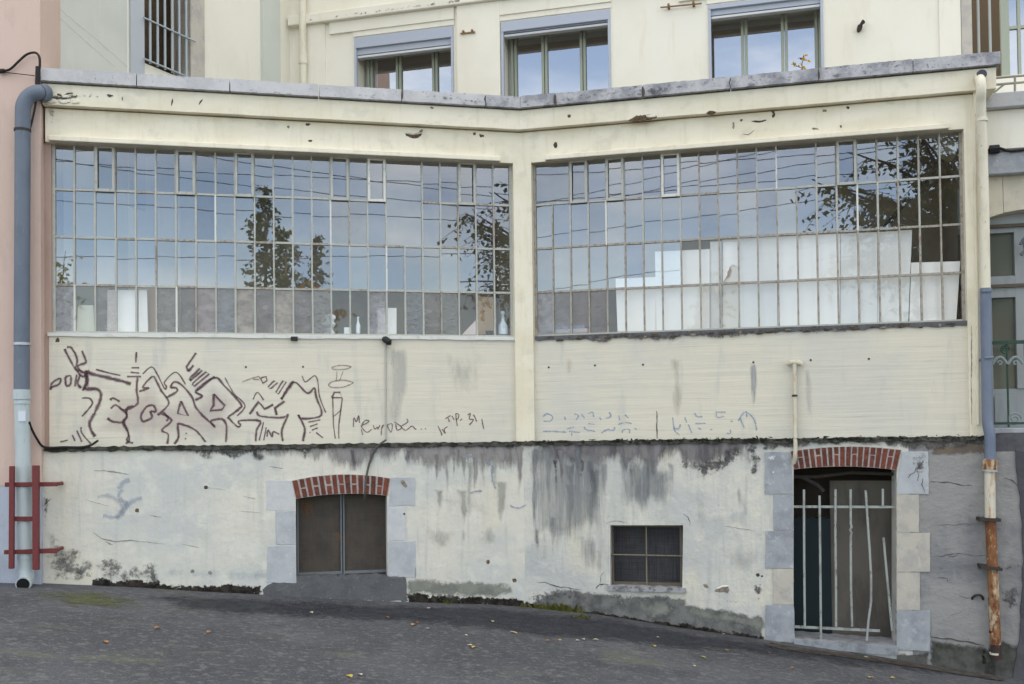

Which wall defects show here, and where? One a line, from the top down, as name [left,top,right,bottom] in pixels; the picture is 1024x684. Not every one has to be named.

spalling [405,130,423,139]
spalling [628,114,657,122]
damp [253,442,760,528]
crack [908,459,972,492]
damp [53,546,157,582]